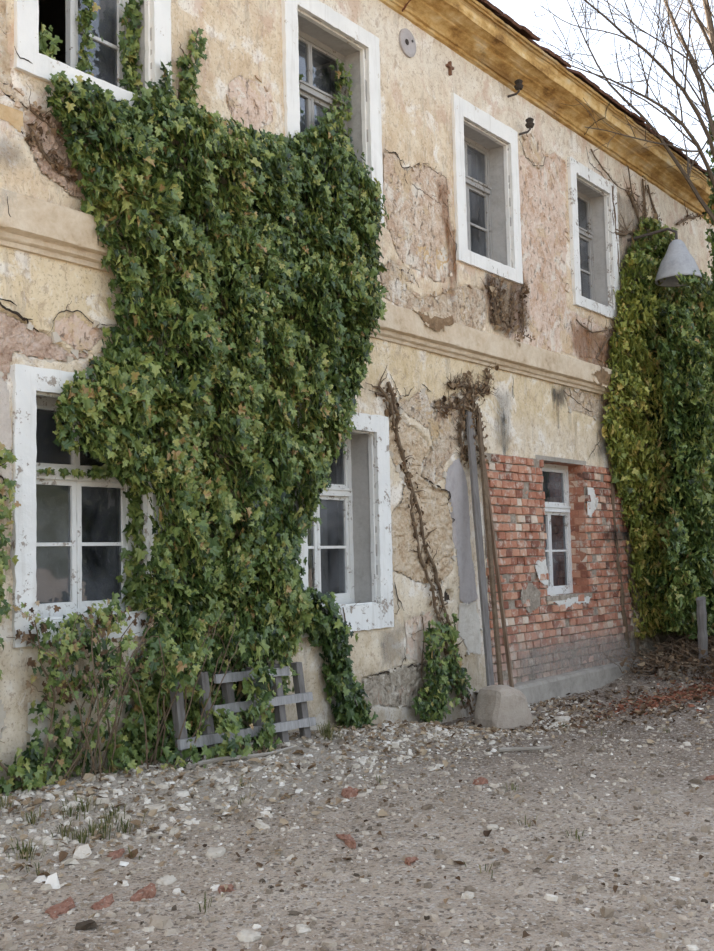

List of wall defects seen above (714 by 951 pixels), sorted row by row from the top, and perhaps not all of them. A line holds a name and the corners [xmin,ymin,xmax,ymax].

flaking render [0,0,96,199]
flaking render [380,152,487,332]
flaking render [0,312,112,381]
flaking render [389,388,482,655]
flaking render [362,609,436,710]